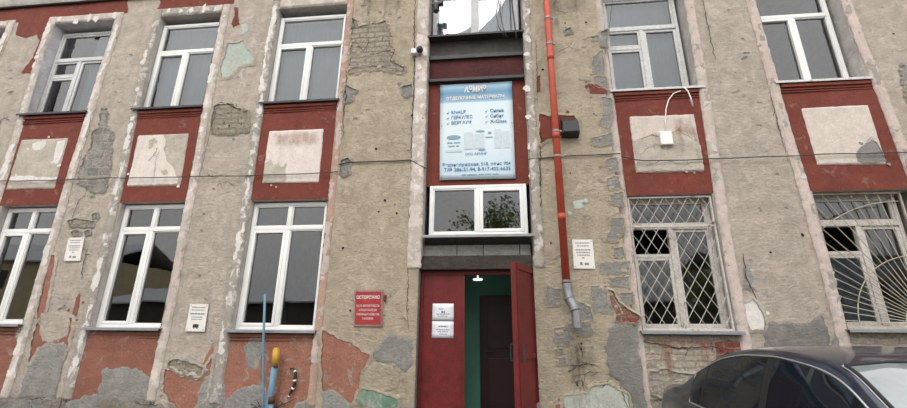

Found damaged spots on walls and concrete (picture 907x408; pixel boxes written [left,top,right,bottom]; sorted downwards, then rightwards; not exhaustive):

peeling [16,17,62,132]
peeling [96,12,118,77]
spalling [199,6,277,141]
spalling [328,4,427,198]
spalling [63,90,193,213]
spalling [55,211,107,246]
peeling [90,258,104,292]
peeling [233,150,254,276]
peeling [732,259,770,334]
peeling [152,321,226,408]
peeling [311,309,403,408]
peeling [555,380,633,408]